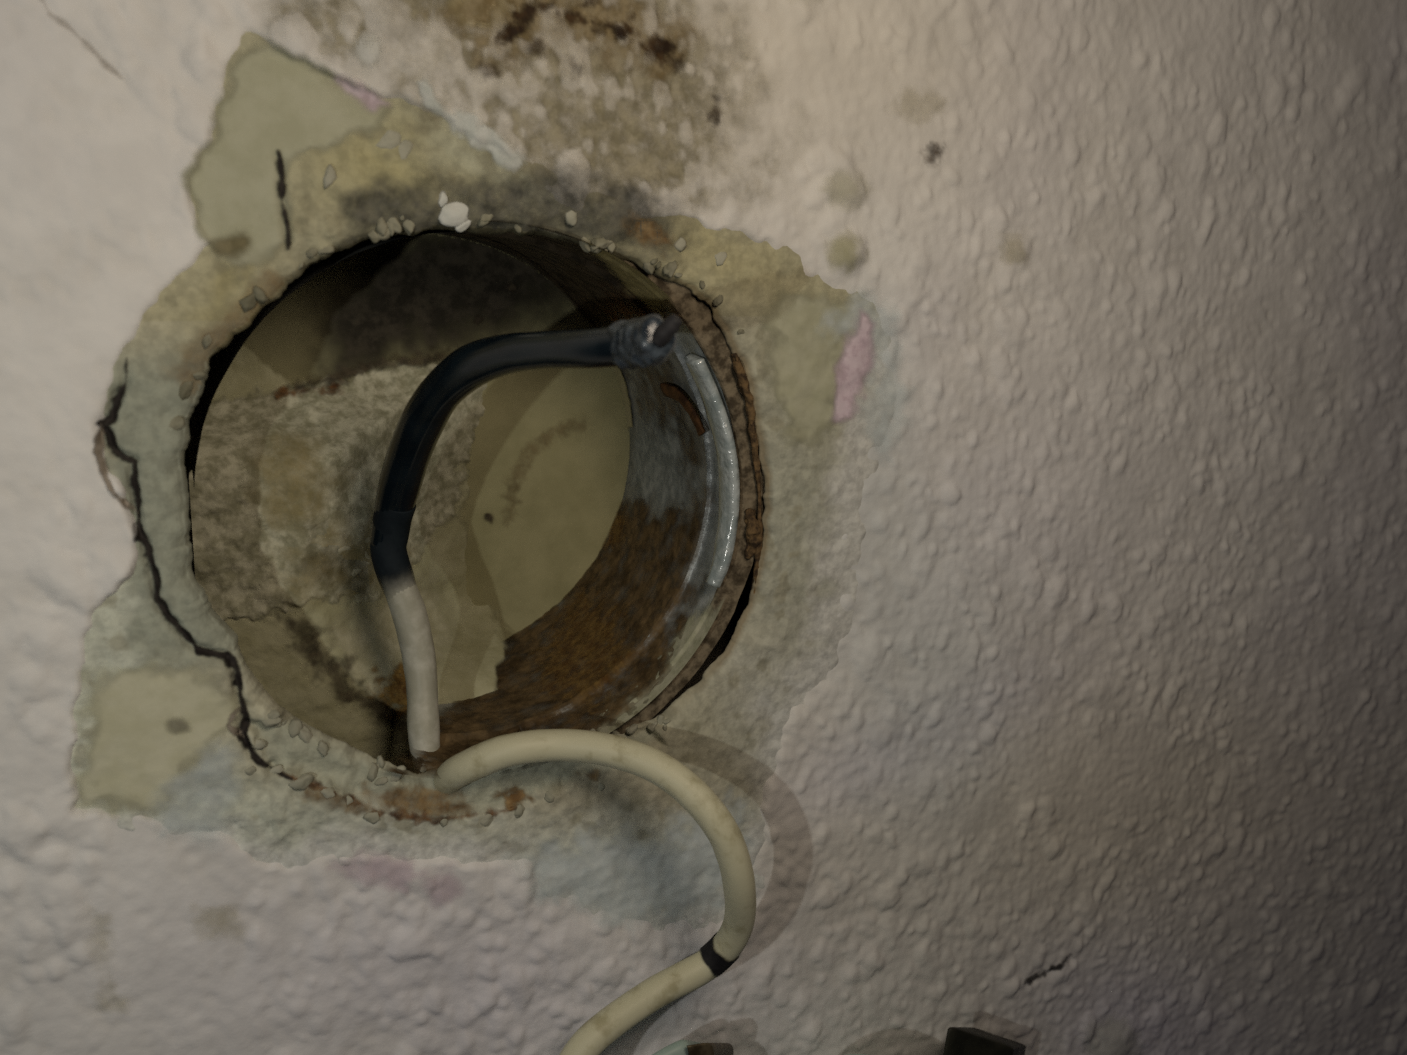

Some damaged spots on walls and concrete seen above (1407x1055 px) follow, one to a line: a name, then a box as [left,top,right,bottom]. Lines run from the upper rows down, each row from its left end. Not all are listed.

leakage [282,0,366,55]
peeling [184,44,415,264]
spalling [437,191,493,232]
peeling [420,81,522,169]
leakage [402,0,722,207]
spalling [565,209,616,254]
peeling [764,293,873,445]
crack [93,363,292,780]
peeling [77,667,238,813]
spalling [252,710,329,756]
spalling [367,755,427,786]
rust [285,499,701,824]